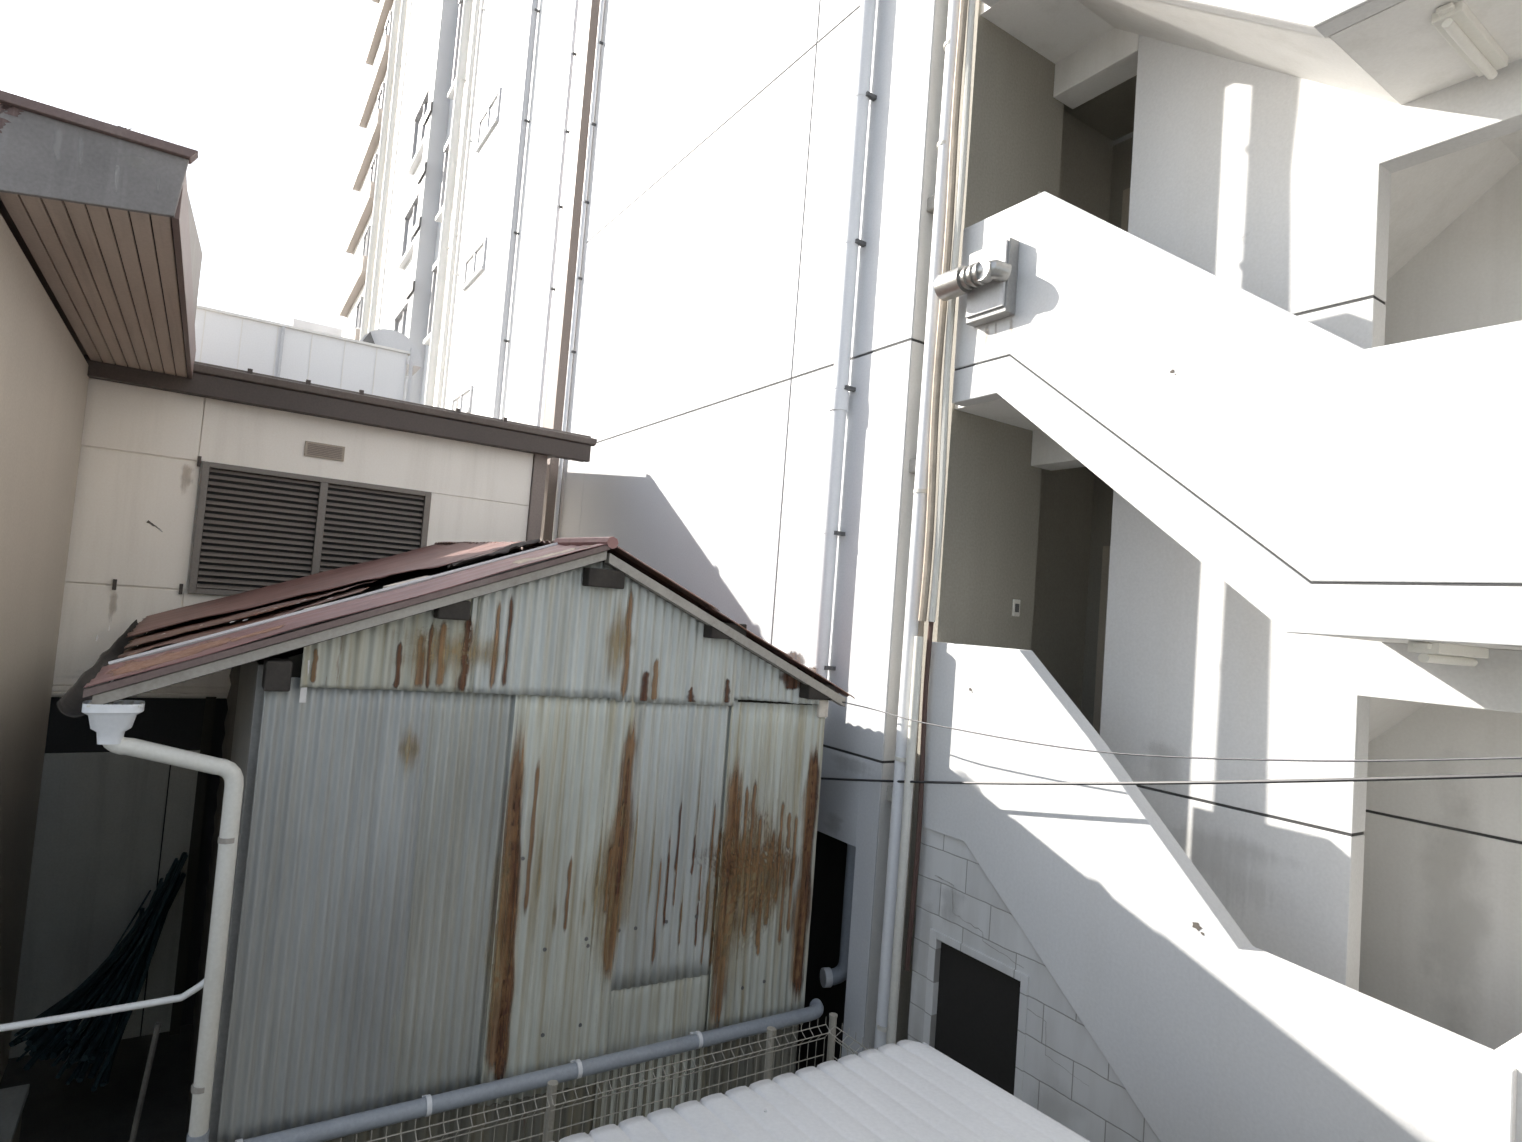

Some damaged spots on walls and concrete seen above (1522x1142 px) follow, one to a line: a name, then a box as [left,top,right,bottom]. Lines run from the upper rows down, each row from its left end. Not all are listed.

rust [109,625,284,676]
rust [310,649,318,682]
rust [393,597,513,691]
rust [487,738,542,1080]
rust [553,727,819,1026]